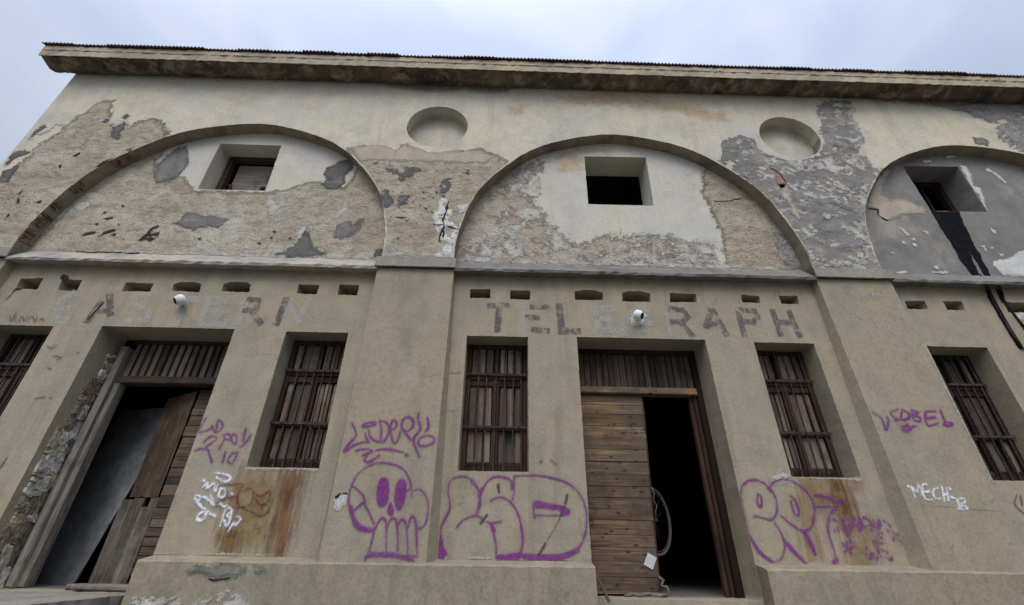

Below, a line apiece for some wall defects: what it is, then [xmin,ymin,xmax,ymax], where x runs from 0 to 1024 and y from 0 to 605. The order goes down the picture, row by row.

flaking render [939,102,1024,152]
flaking render [0,99,928,271]
peeling [946,155,988,211]
crack [434,201,459,242]
flaking render [0,354,117,588]
rust [221,470,305,557]
flaking render [185,553,276,582]